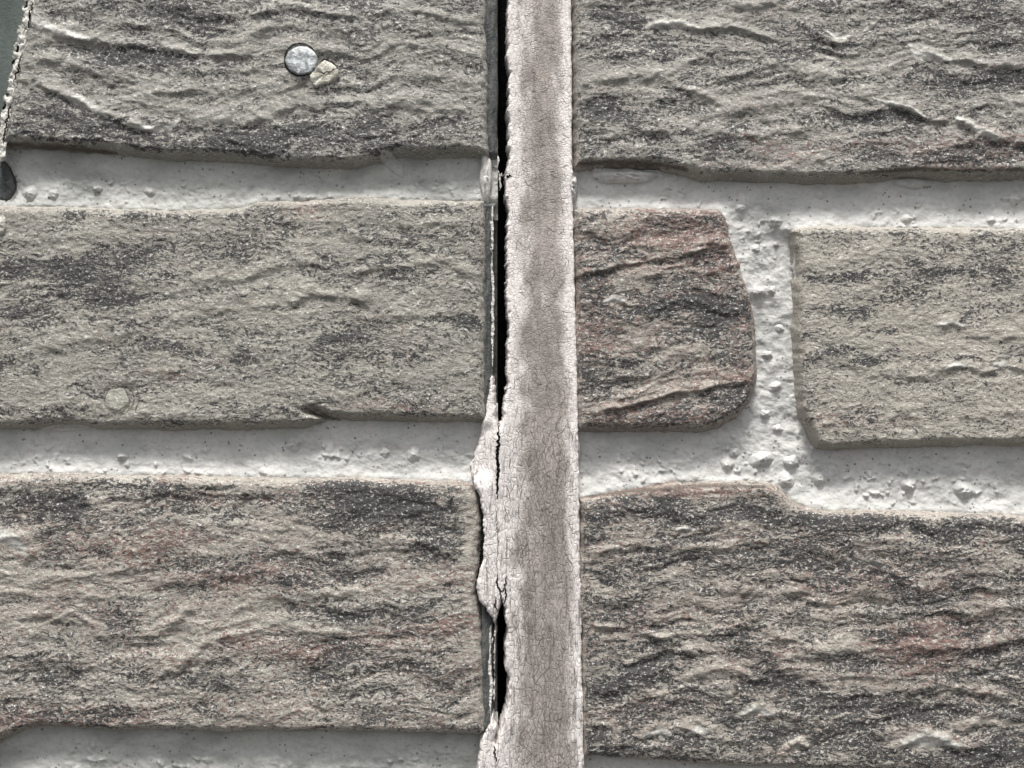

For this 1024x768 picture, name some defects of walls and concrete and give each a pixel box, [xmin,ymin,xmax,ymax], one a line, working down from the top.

crack [475,0,579,768]